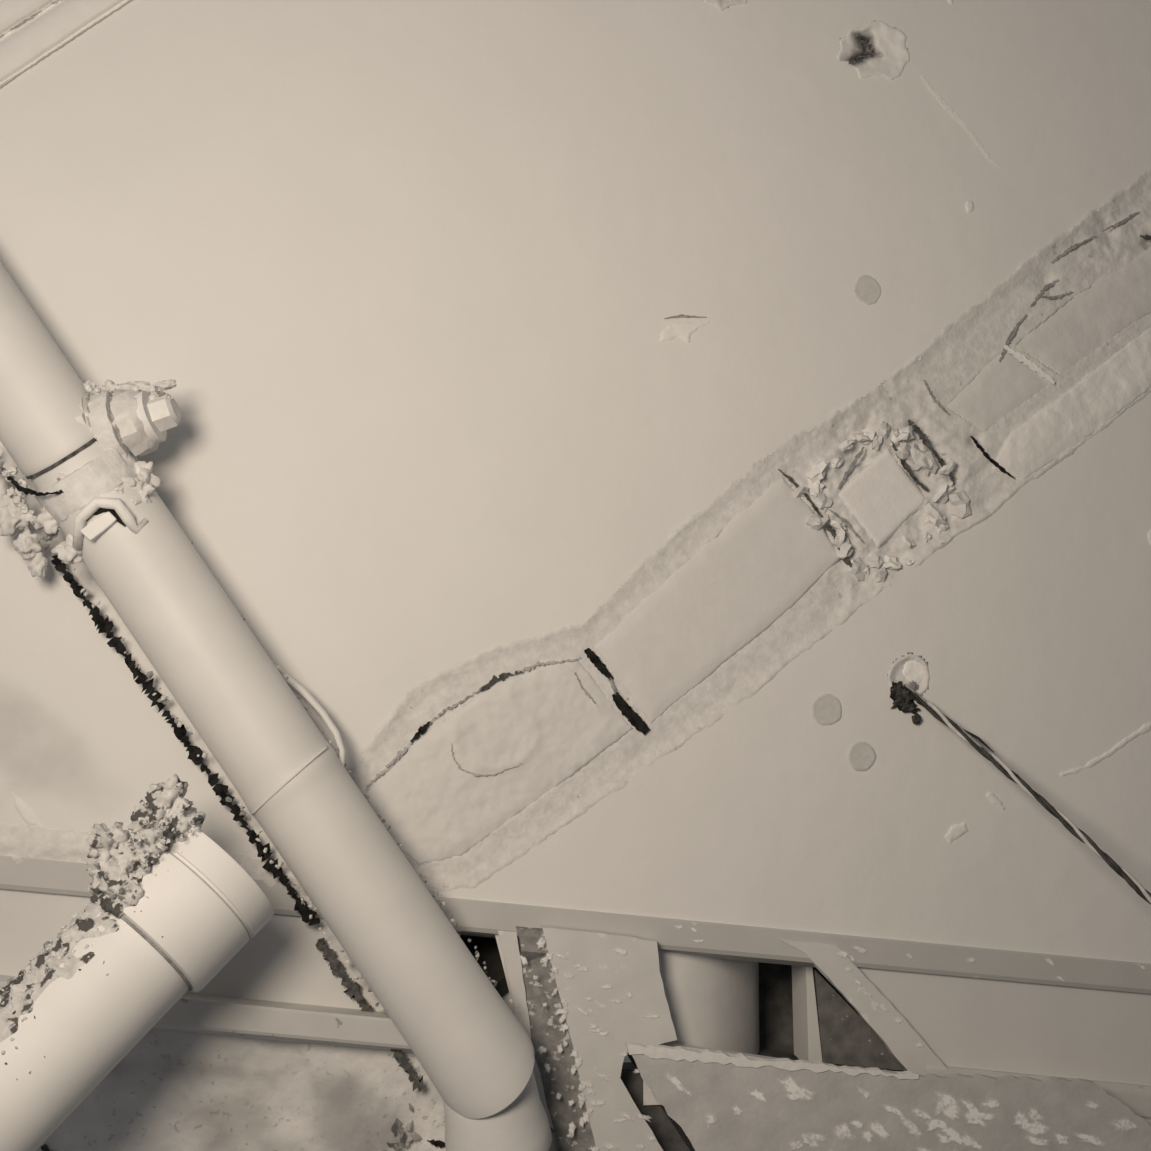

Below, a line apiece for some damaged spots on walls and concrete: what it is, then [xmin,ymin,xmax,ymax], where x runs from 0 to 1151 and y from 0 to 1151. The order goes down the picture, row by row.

spalling [837,20,910,80]
crack [999,212,1151,362]
crack [924,380,949,414]
crack [891,419,955,492]
crack [970,435,1015,479]
flaking render [346,168,1151,897]
crack [778,447,865,567]
crack [365,648,650,791]
crack [29,509,388,1017]
flaking render [0,824,97,864]
flaking render [228,853,300,884]
crack [390,1049,426,1092]